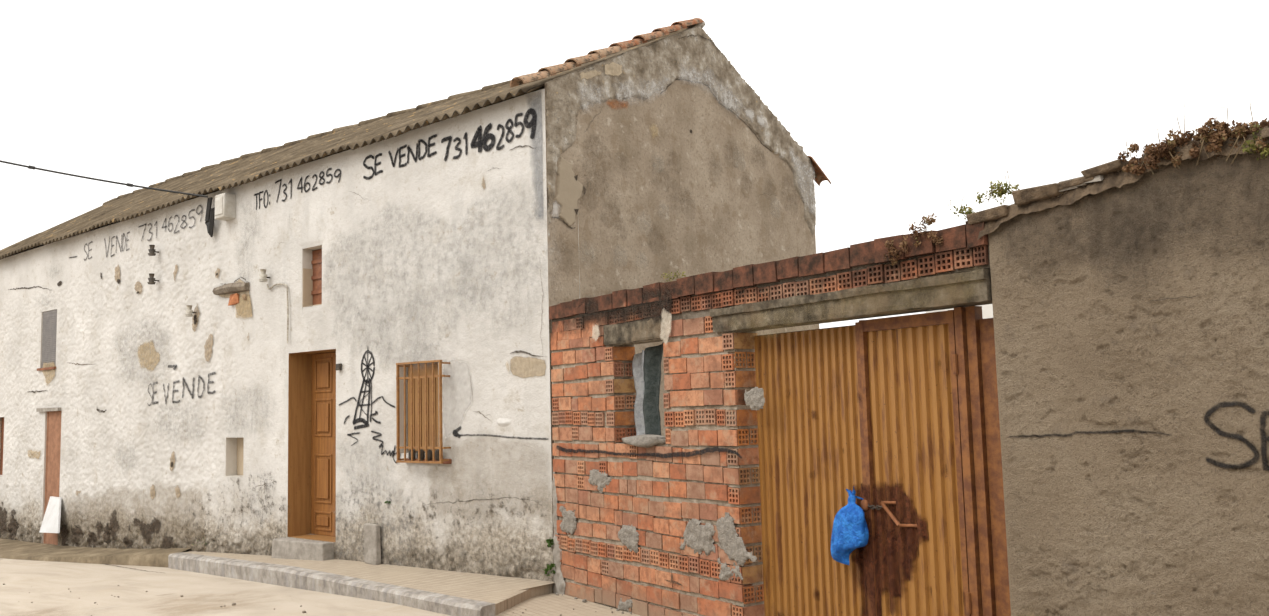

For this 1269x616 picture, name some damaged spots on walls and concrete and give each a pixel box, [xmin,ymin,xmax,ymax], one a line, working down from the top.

peeling [546,26,816,250]
spalling [213,268,252,318]
peeling [507,350,546,378]
water stain [336,489,491,573]